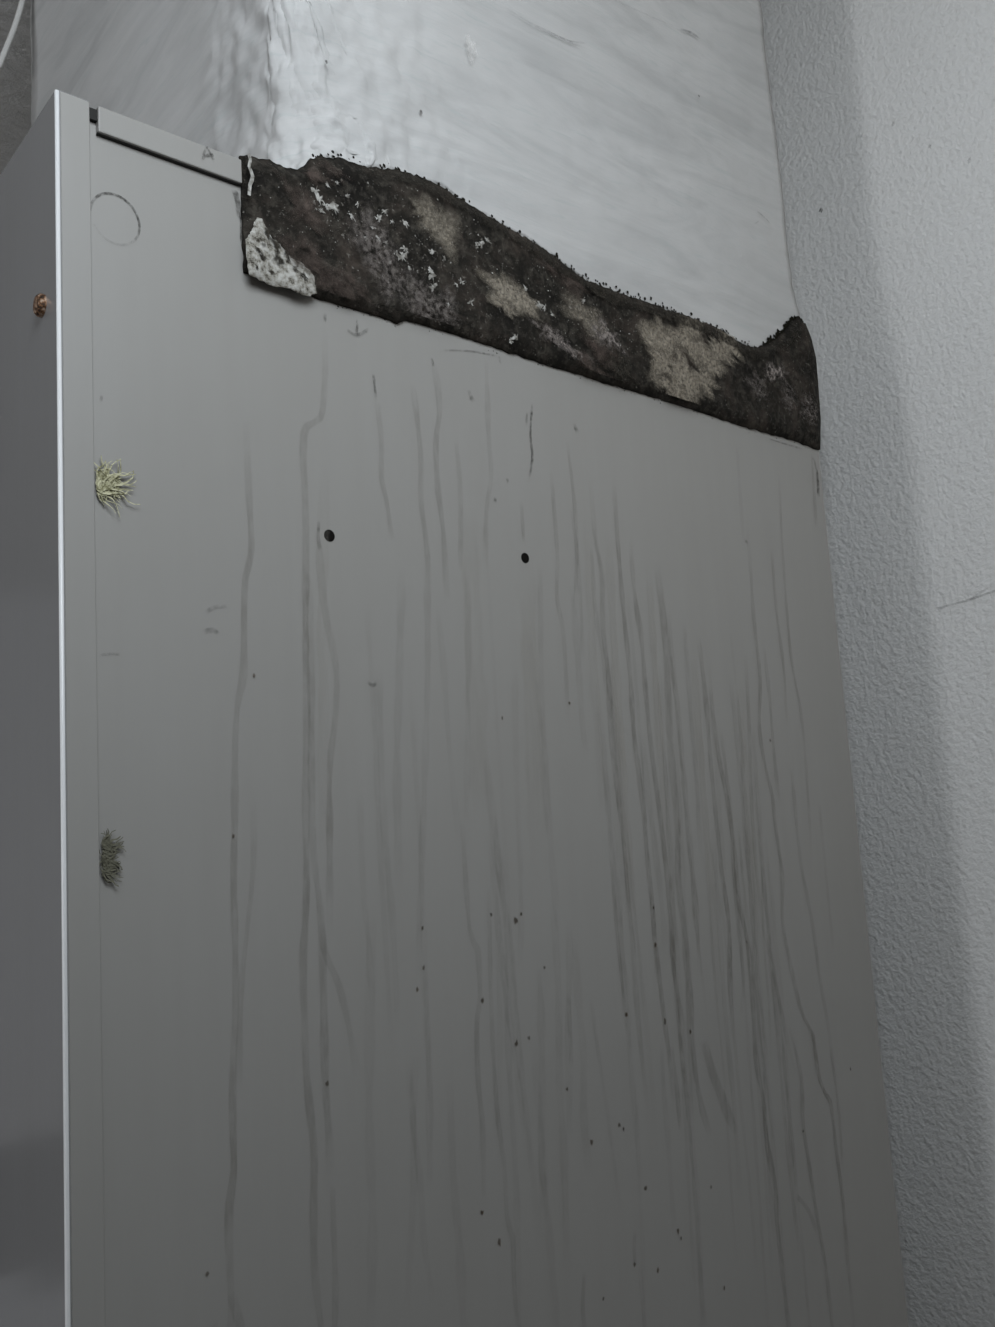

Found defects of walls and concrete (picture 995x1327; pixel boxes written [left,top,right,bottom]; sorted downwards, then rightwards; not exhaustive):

damp [238,150,821,450]